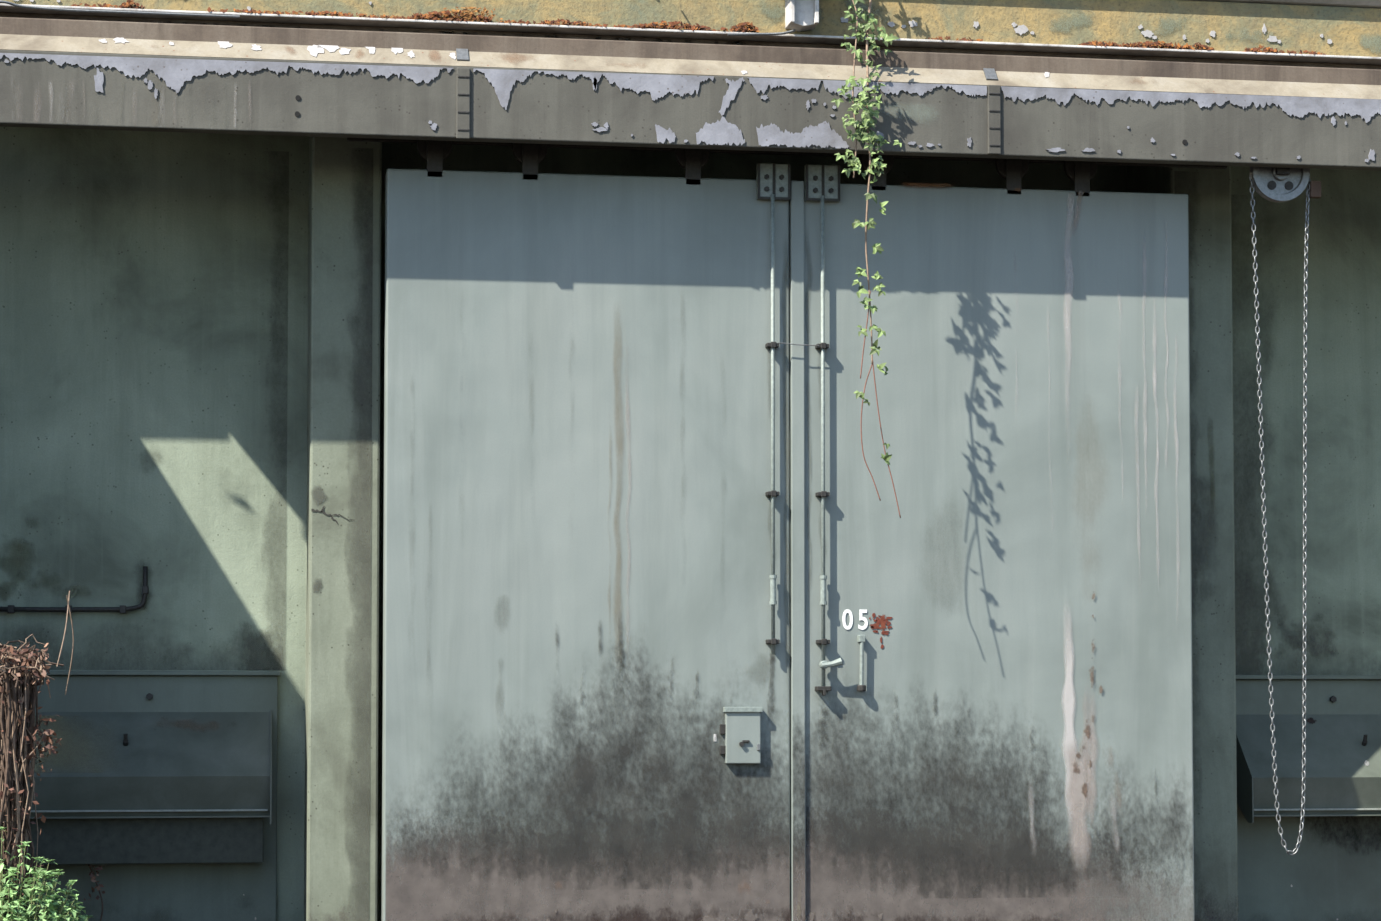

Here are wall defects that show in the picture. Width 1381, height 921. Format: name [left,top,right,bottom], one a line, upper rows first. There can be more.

peeling [0,37,456,99]
peeling [473,68,1381,149]
crack [311,506,353,524]
water stain [1234,421,1270,675]
rust [869,613,892,648]
water stain [466,638,1192,921]
rust [1074,717,1094,797]